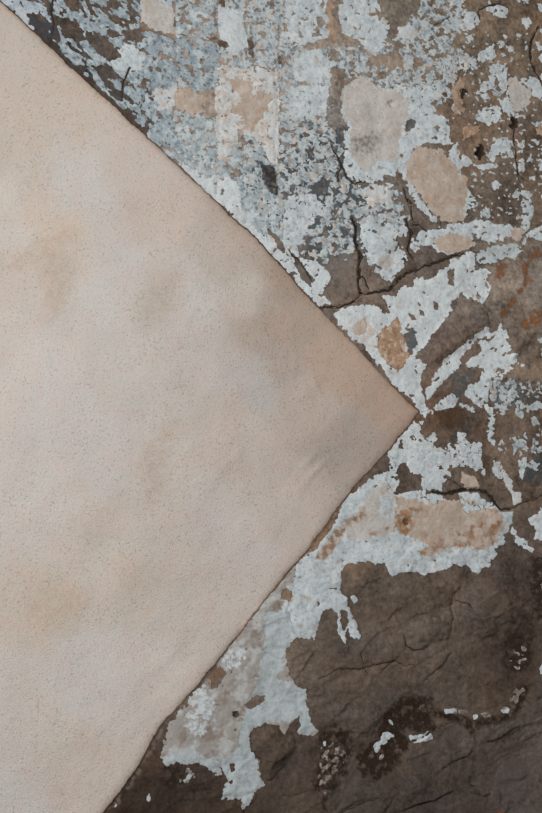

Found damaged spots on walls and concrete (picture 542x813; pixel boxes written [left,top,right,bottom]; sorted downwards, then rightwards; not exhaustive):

crack [529,26,542,84]
crack [331,145,365,185]
crack [512,116,530,184]
peeling [1,0,542,453]
crack [319,188,464,309]
peeling [509,416,542,479]
crack [432,476,541,511]
peeling [528,507,542,541]
peeling [160,421,534,810]
crack [319,635,453,681]